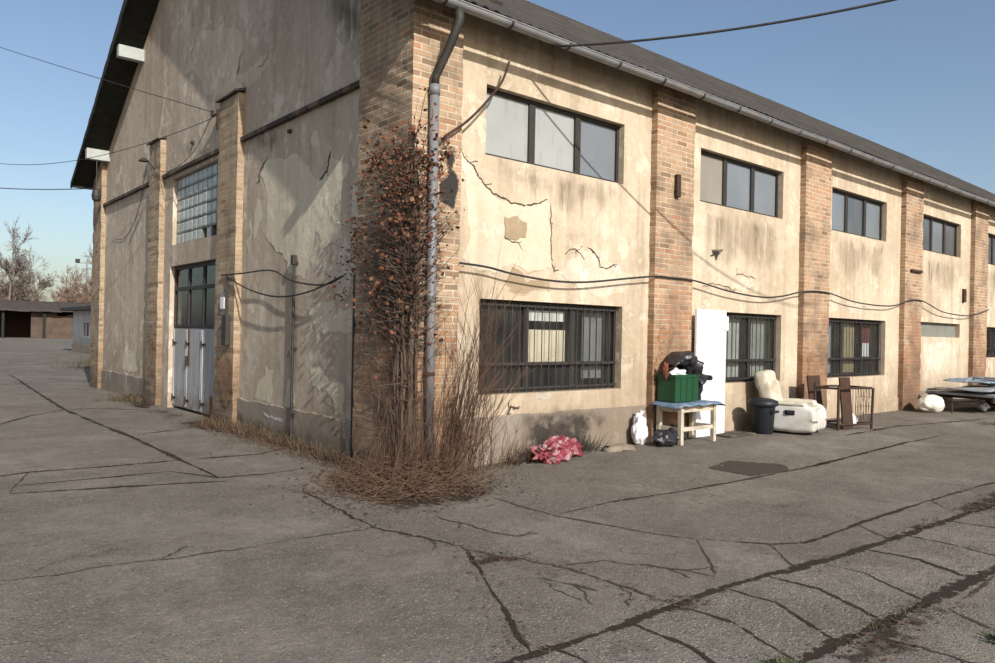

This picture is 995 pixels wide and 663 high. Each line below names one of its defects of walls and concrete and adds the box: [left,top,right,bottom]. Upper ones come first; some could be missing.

flaking render [254,153,358,279]
crack [461,149,616,272]
flaking render [461,150,633,298]
flaking render [307,300,352,343]
flaking render [309,367,346,415]
crack [0,374,995,663]